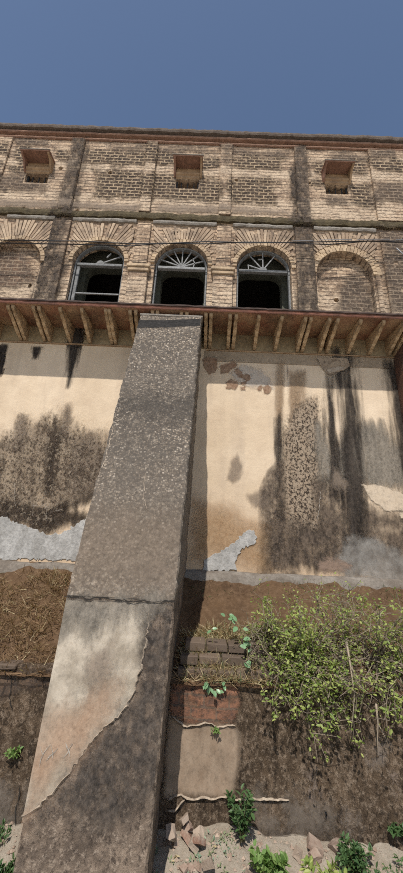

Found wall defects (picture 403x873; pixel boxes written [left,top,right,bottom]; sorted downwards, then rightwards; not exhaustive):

water stain [67,328,84,387]
peeling [202,357,273,394]
water stain [0,411,105,533]
water stain [196,347,403,574]
peeling [0,593,163,820]